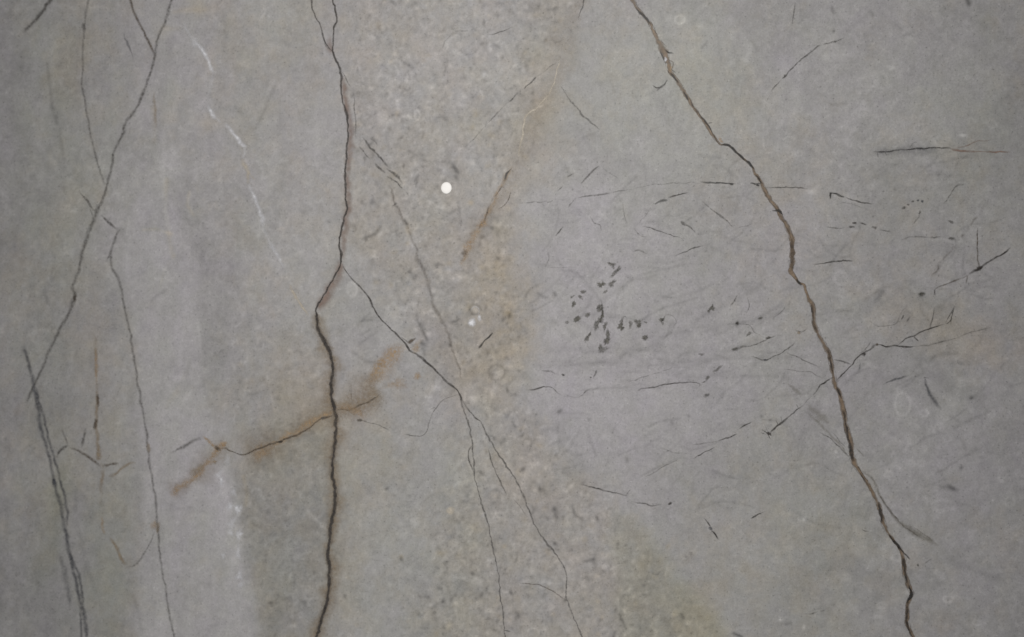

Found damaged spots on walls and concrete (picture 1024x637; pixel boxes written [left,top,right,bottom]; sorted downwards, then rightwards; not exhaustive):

crack [311,0,567,637]
crack [631,0,953,637]
crack [880,145,1004,153]
crack [919,234,1008,295]